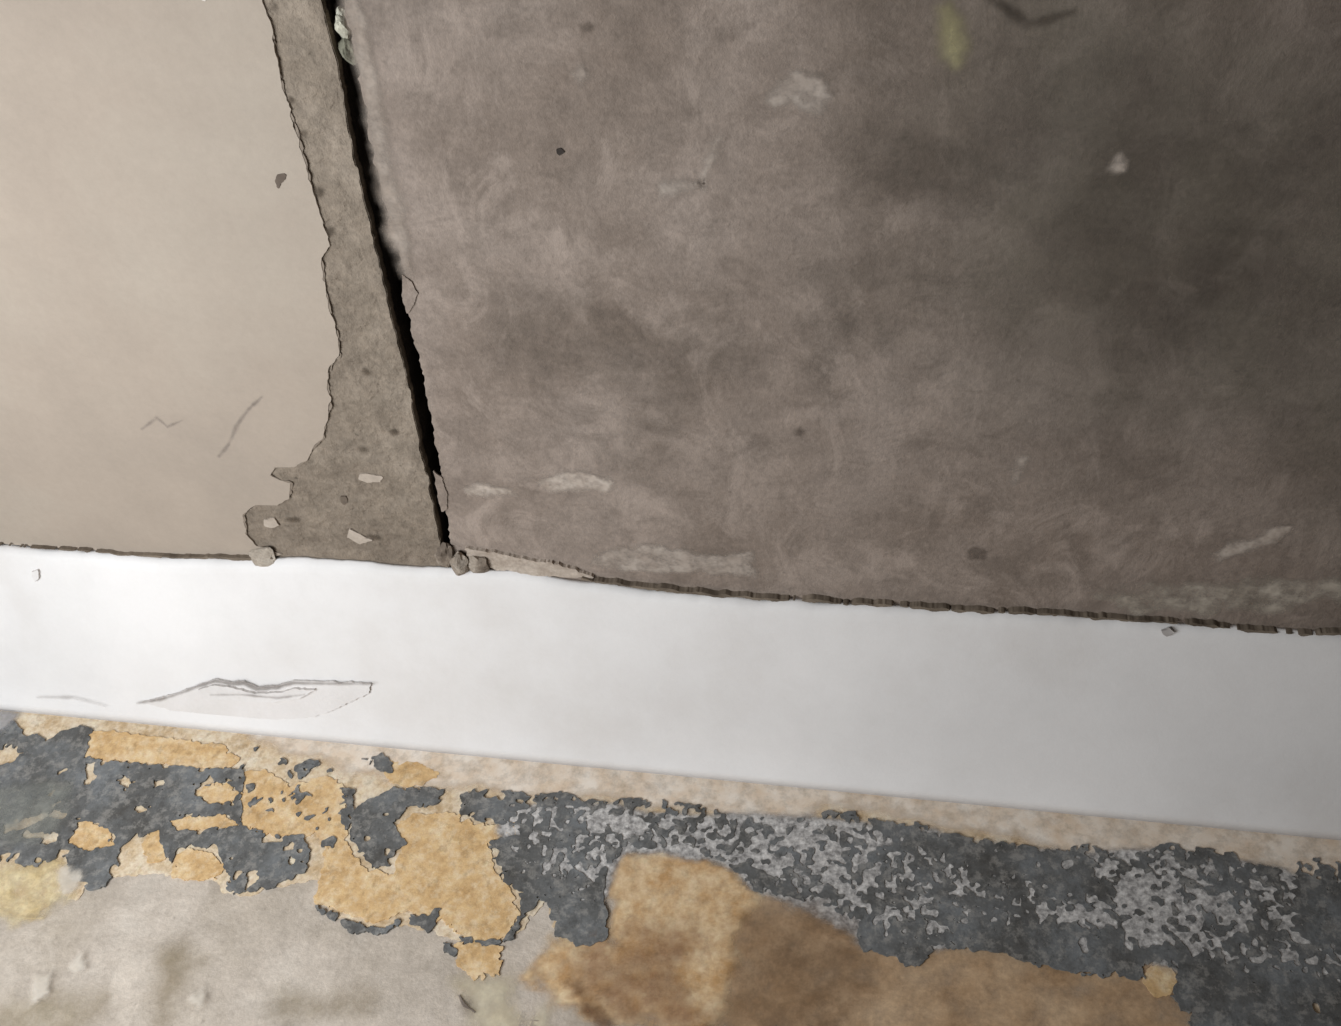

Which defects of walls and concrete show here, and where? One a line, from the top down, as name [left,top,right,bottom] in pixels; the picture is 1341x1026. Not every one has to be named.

flaking render [243,0,440,566]
crack [327,0,451,567]
peeling [0,678,1341,1026]